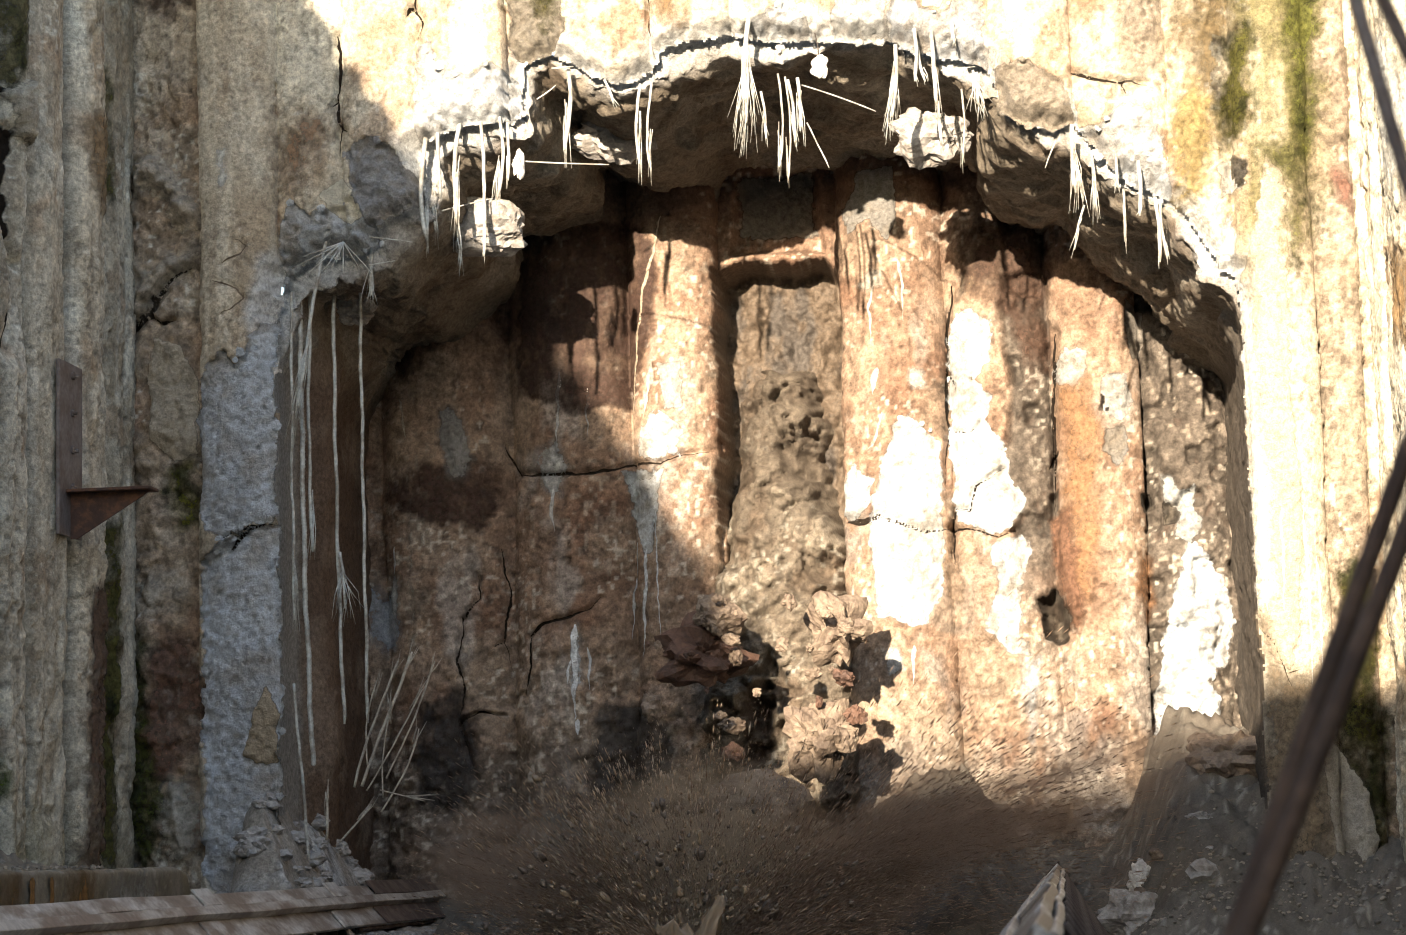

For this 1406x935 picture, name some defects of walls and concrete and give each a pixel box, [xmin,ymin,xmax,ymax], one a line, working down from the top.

crack [406,0,424,41]
leakage [1175,0,1224,90]
crack [136,268,192,333]
crack [505,445,703,480]
spalling [147,0,1305,894]
crack [456,549,601,775]